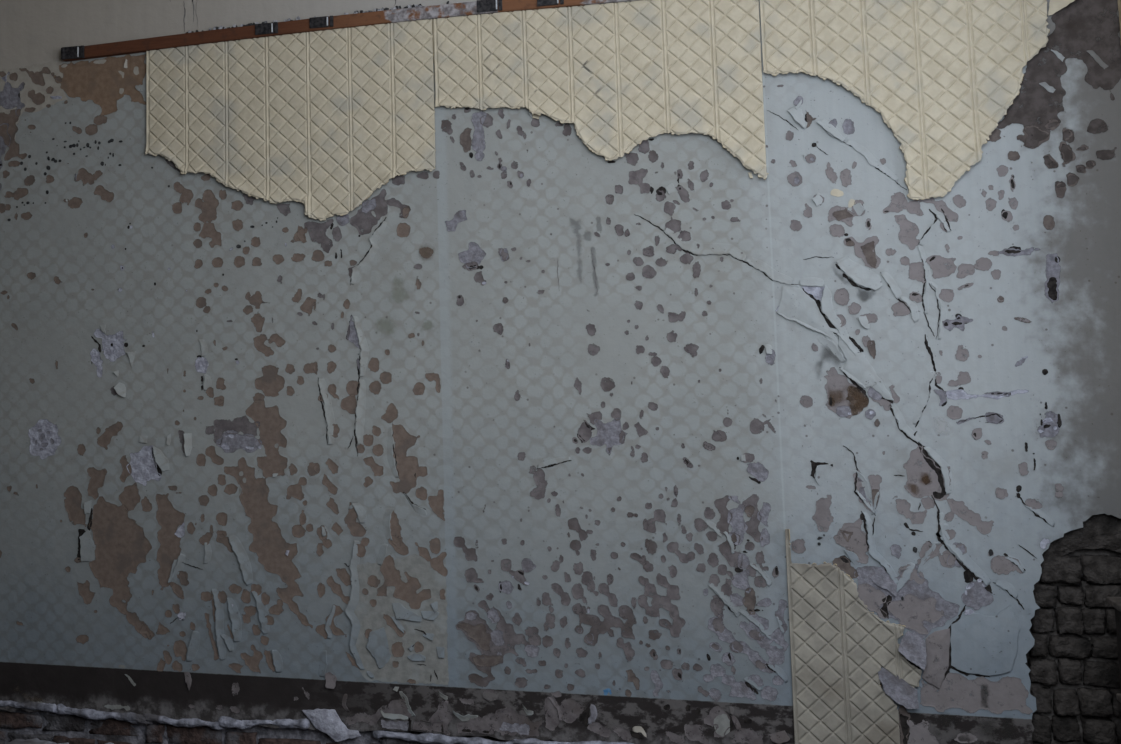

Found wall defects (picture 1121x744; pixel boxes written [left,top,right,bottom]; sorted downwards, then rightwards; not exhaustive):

peeling [0,54,146,220]
peeling [164,157,440,289]
peeling [441,107,540,188]
spalling [458,242,530,285]
peeling [594,138,734,378]
crack [634,214,834,285]
crack [830,328,869,362]
spalling [776,143,1061,427]
crack [871,208,1024,647]
spalling [934,345,1028,459]
peeling [982,0,1121,231]
peeling [0,289,790,744]